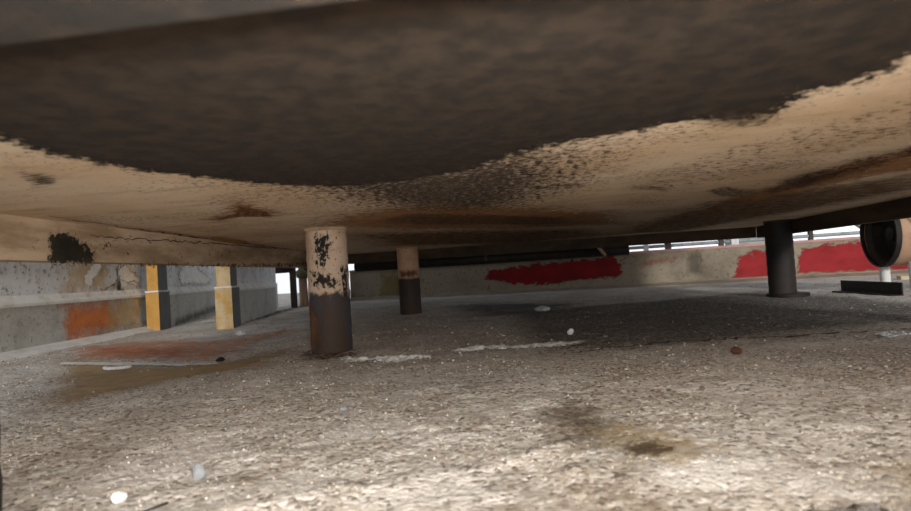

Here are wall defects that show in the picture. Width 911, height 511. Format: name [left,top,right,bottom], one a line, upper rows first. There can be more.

water stain [0,0,911,216]
corrosion [731,148,911,203]
corrosion [202,202,277,221]
peeling [309,232,349,299]
corrosion [296,303,360,360]